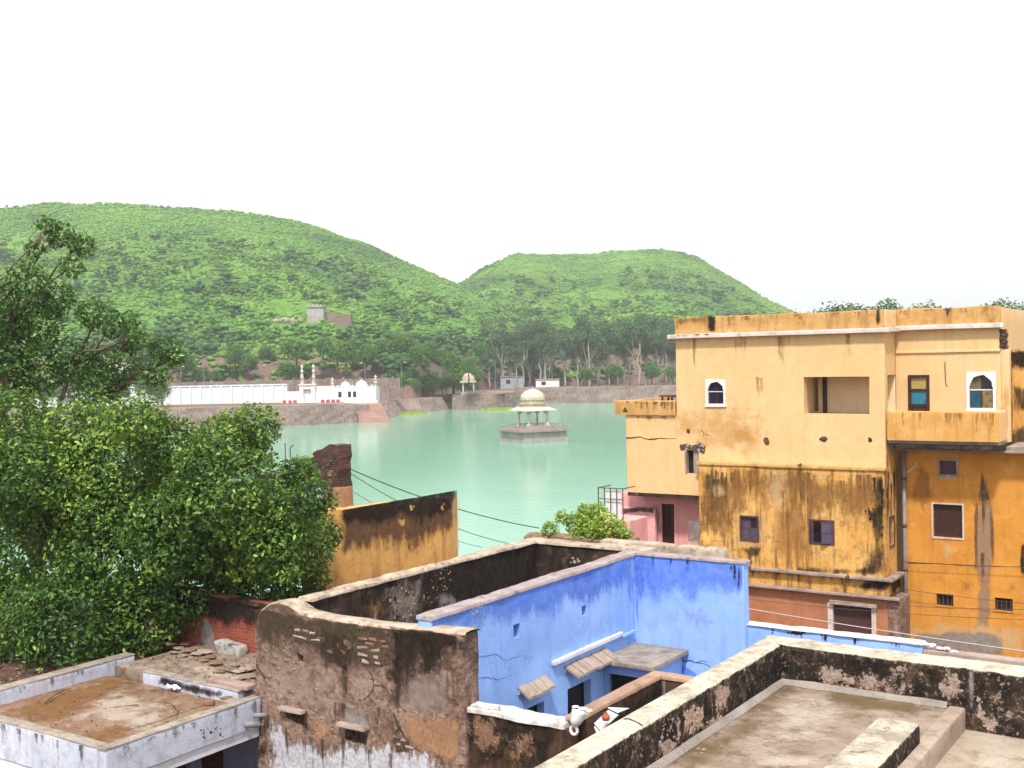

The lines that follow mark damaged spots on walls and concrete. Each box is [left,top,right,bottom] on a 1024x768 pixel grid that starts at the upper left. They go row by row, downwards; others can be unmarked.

leakage [677,316,715,336]
crack [626,434,676,442]
leakage [342,491,458,552]
leakage [705,470,759,538]
leakage [792,470,904,593]
leakage [975,476,994,627]
spalling [352,631,392,667]
peeling [402,671,446,713]
peeling [818,665,909,695]
peeling [939,673,964,700]
peeling [976,696,998,732]
spalling [393,737,414,753]